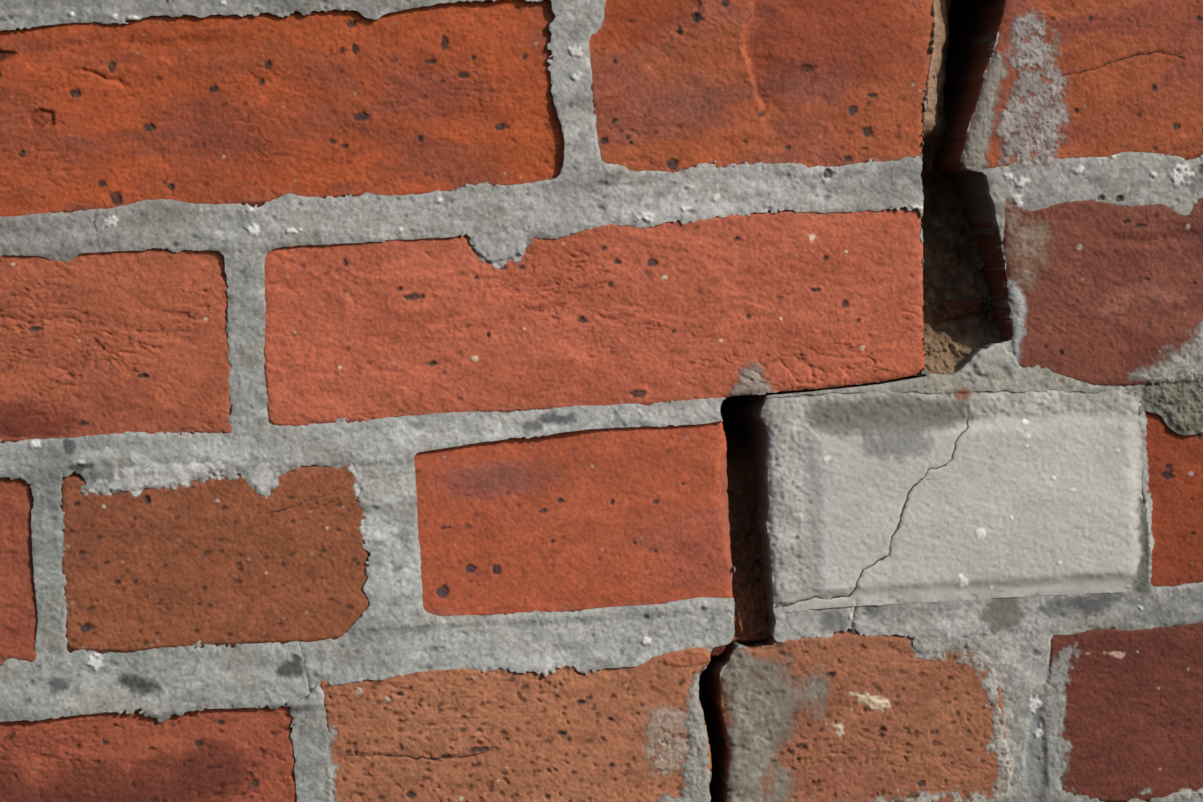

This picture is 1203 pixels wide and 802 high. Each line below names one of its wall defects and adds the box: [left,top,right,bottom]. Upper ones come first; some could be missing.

crack [711,0,1001,657]
damp [961,11,1069,171]